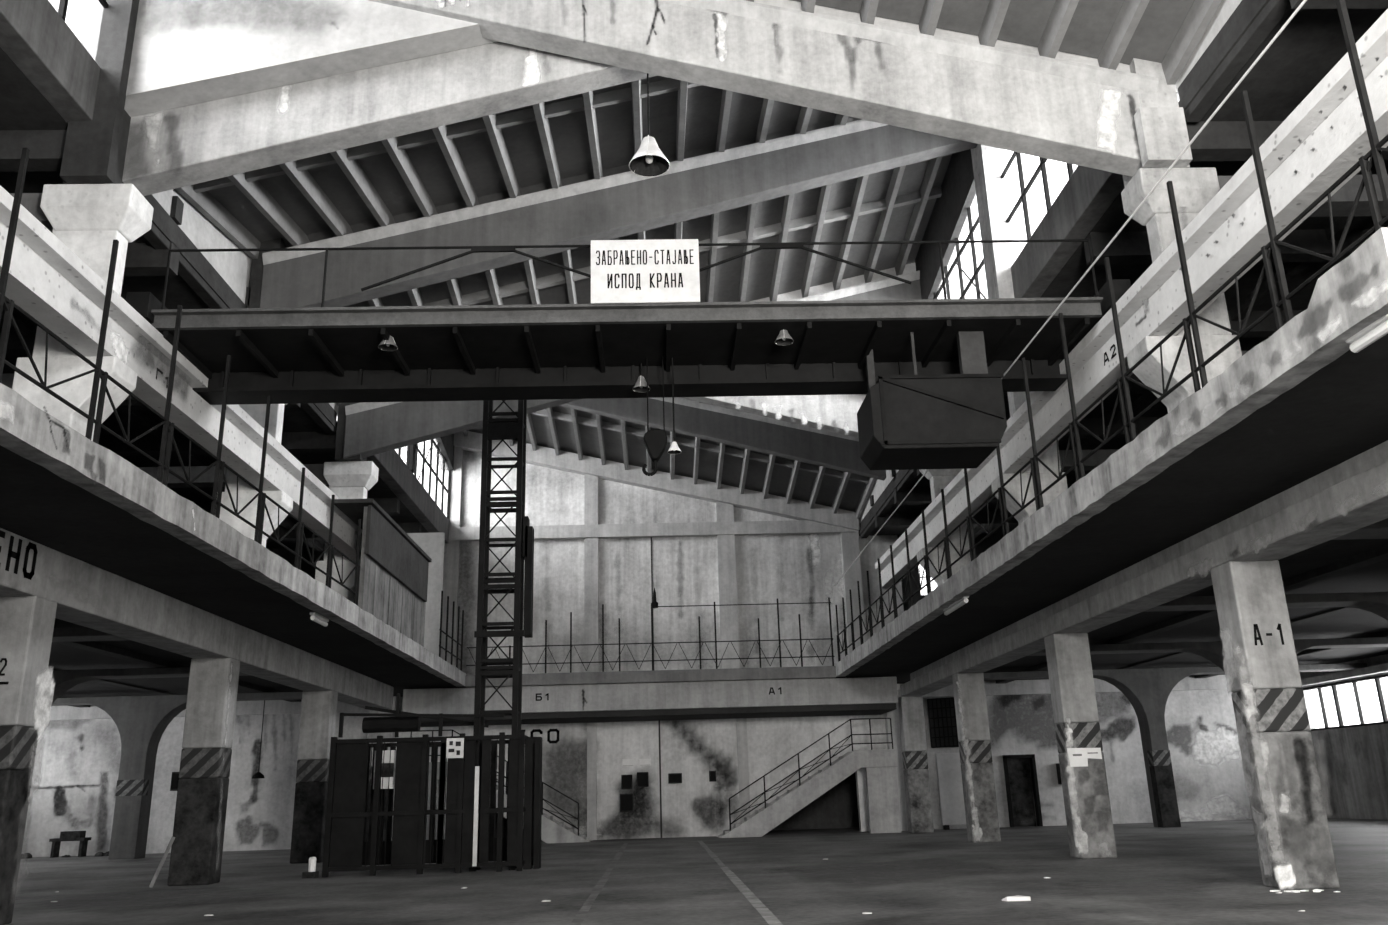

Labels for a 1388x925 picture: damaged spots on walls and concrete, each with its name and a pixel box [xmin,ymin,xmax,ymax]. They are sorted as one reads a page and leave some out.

peeling [237,739,277,844]
peeling [989,694,1110,854]
peeling [1096,692,1135,741]
spalling [1166,631,1296,888]